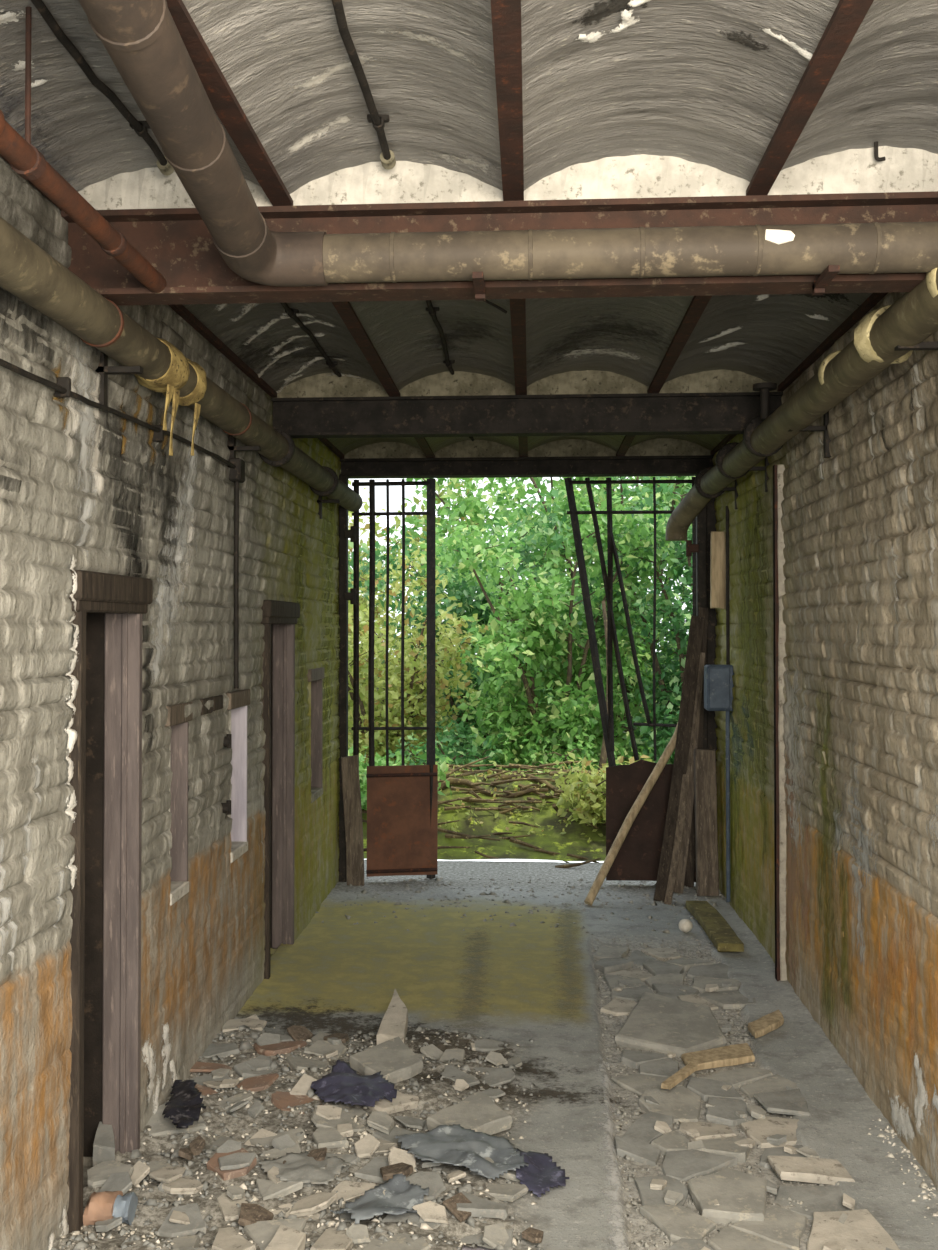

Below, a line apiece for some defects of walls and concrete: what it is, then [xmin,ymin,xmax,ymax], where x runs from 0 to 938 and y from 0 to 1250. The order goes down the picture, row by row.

spalling [572,0,651,44]
spalling [720,28,813,61]
damp [730,534,767,890]
damp [783,665,877,1012]